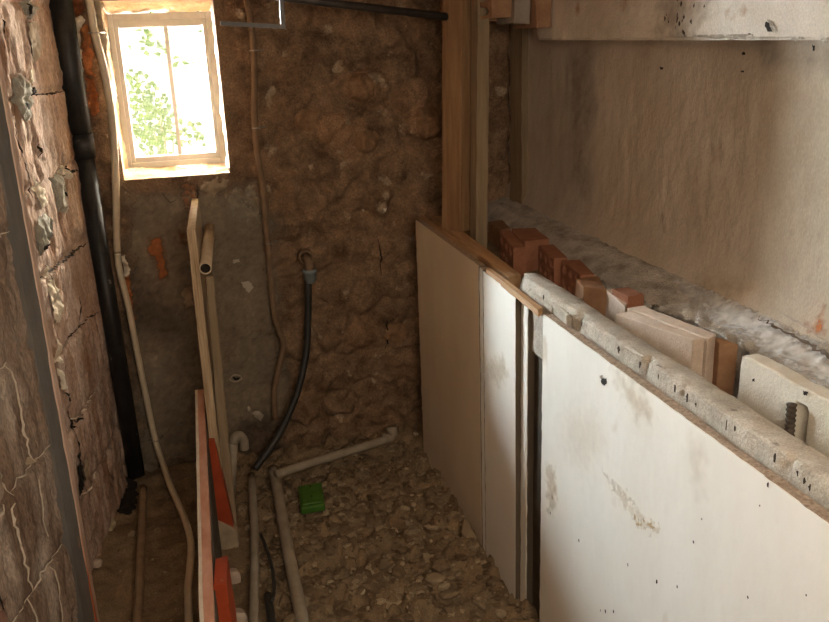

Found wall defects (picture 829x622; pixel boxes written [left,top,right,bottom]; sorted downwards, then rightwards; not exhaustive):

crack [68,302,100,338]
crack [0,362,63,622]
crack [63,390,105,497]